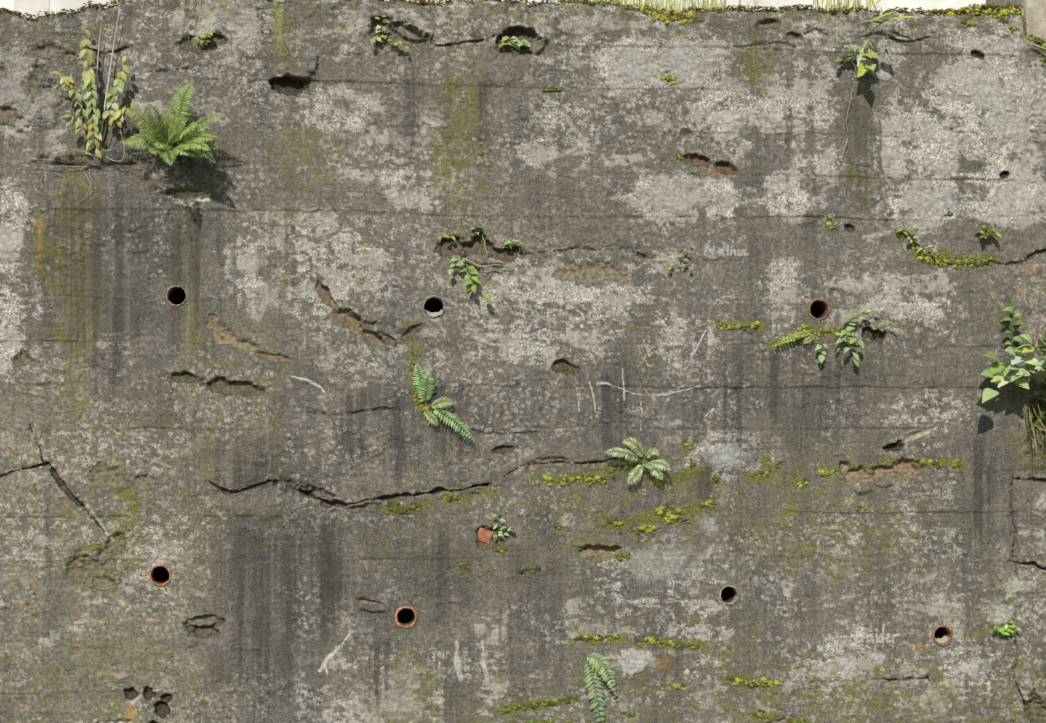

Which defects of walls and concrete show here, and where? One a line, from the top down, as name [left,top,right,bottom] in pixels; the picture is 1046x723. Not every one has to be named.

spalling [680,153,739,175]
spalling [311,279,428,347]
spalling [205,314,293,362]
spalling [899,426,938,443]
crack [0,424,105,532]
crack [209,457,619,508]
spalling [839,457,924,495]
crack [1010,474,1046,570]
leakage [318,632,352,675]
crack [1009,620,1027,709]
spalling [124,686,172,723]